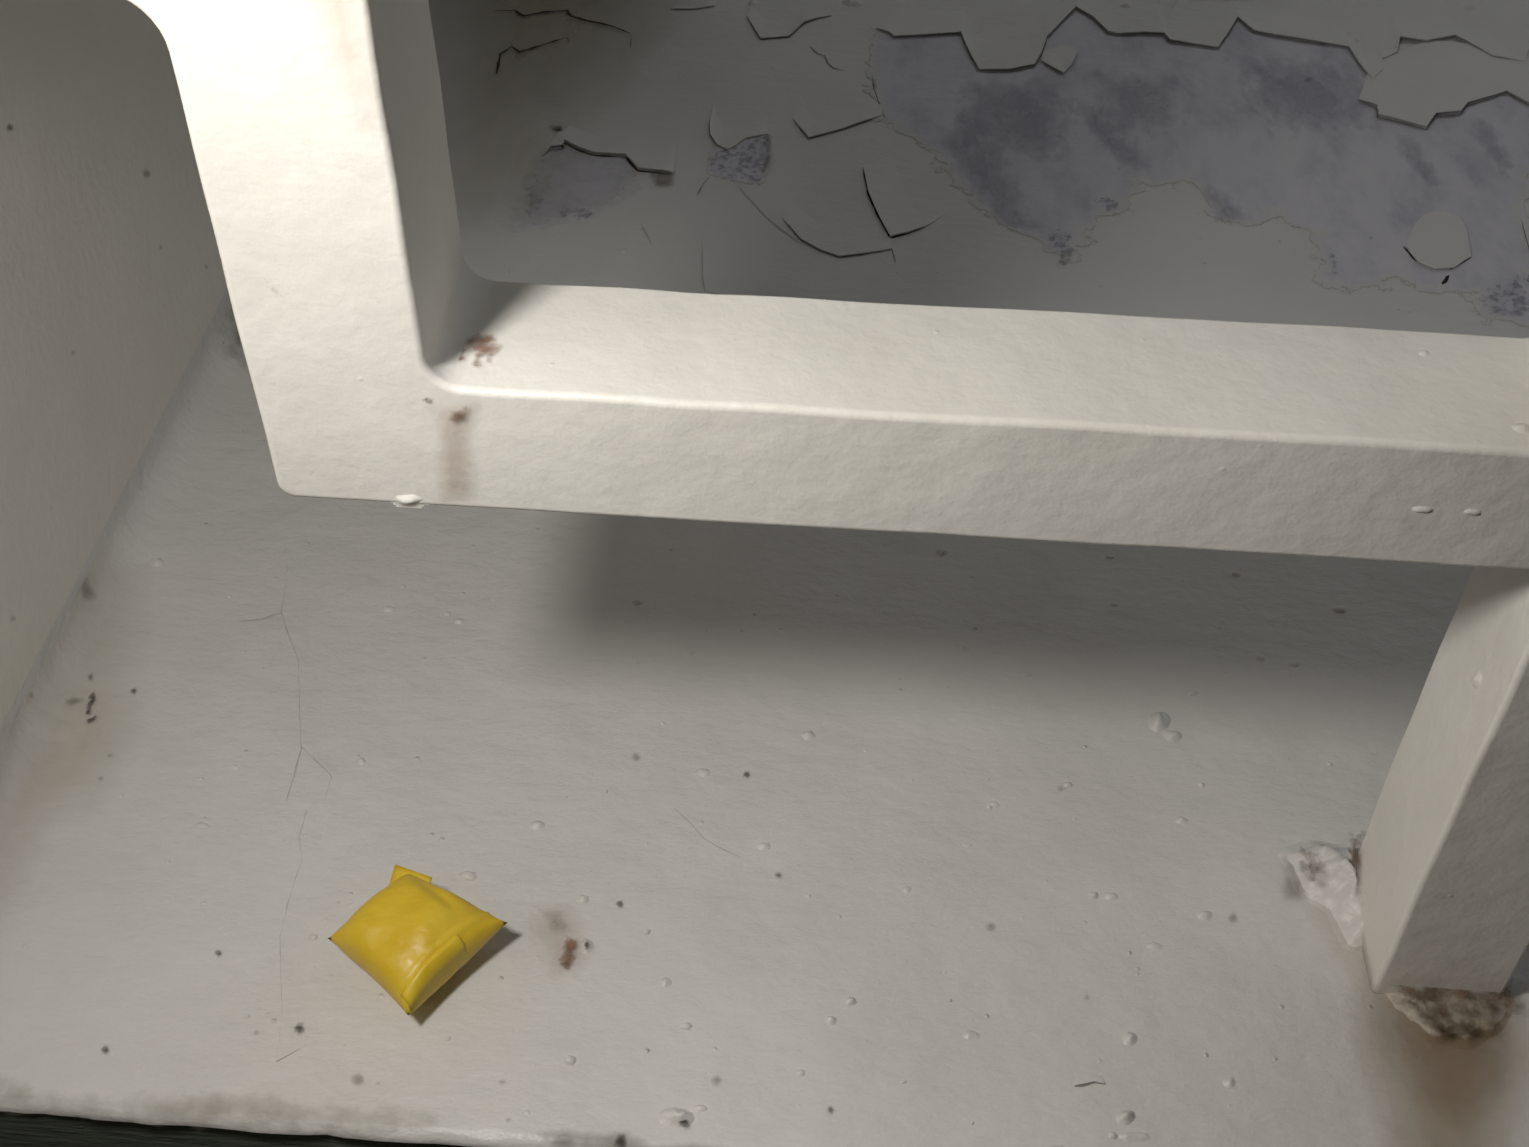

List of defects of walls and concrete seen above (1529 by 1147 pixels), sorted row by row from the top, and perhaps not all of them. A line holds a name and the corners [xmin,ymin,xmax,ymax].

peeling [526,114,677,221]
spalling [706,103,775,185]
peeling [862,0,1529,327]
spalling [1377,987,1514,1050]